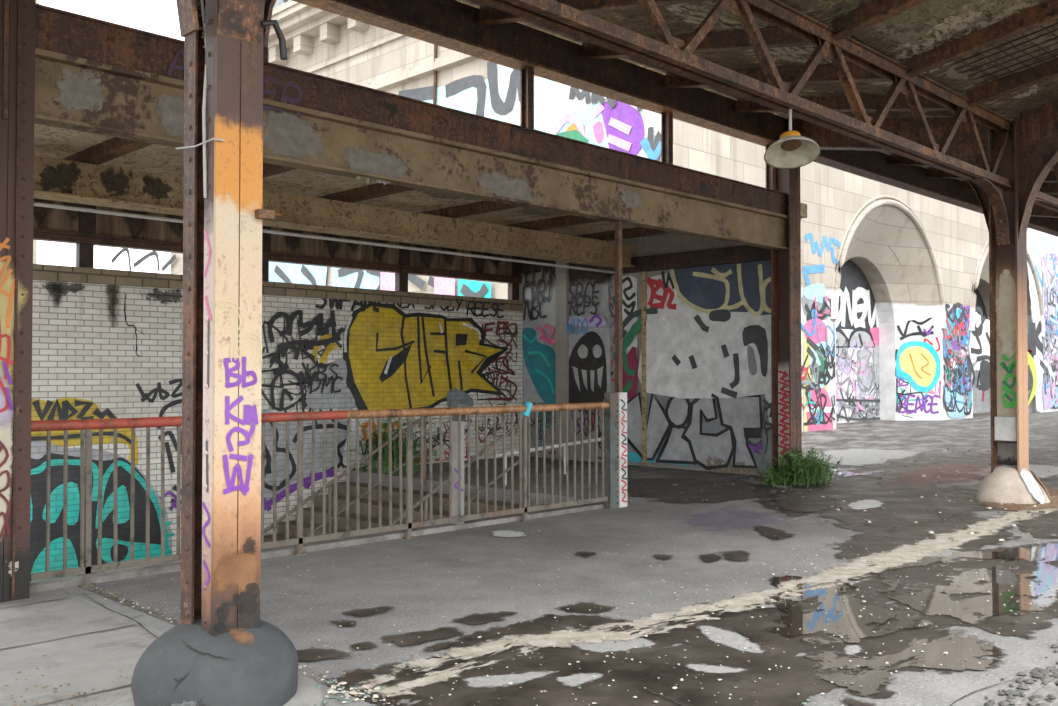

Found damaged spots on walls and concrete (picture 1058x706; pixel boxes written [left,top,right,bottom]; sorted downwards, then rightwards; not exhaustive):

peeling [54,68,105,113]
peeling [155,93,184,136]
peeling [263,111,325,161]
leakage [33,162,83,226]
leakage [96,166,173,201]
peeling [343,147,407,185]
peeling [411,172,561,216]
leakage [123,209,146,238]
leakage [166,214,183,235]
leakage [106,285,118,325]
rust [215,551,259,593]
crack [83,593,236,692]